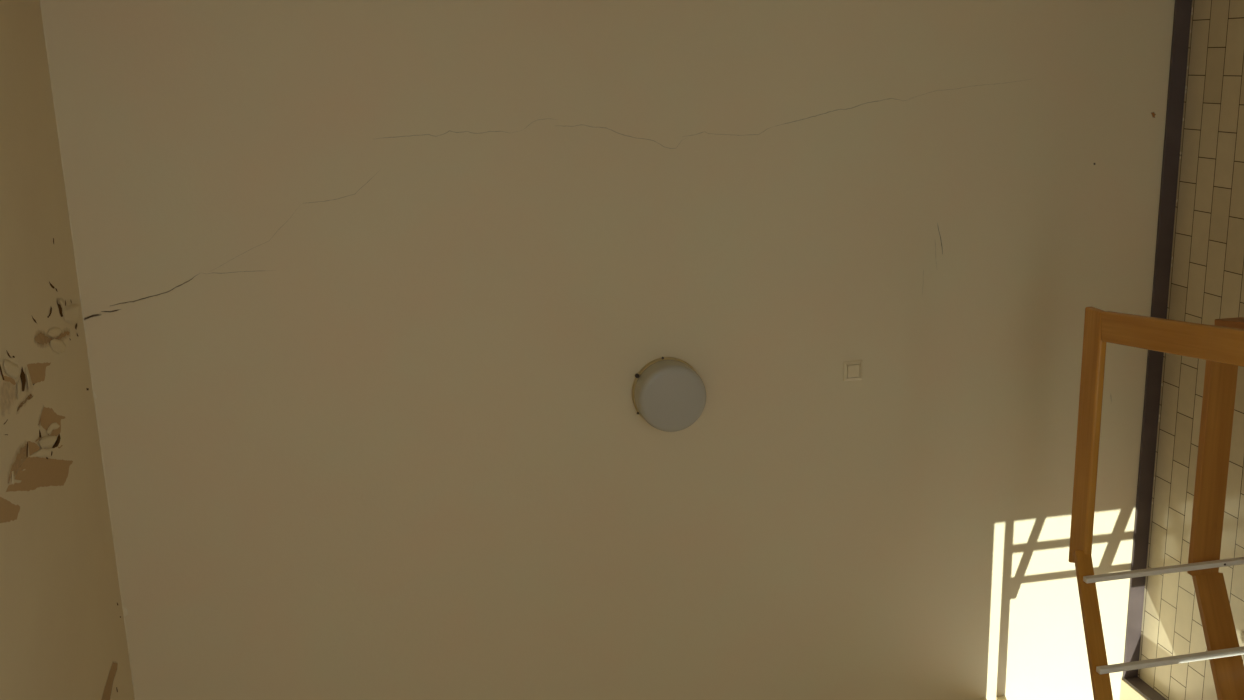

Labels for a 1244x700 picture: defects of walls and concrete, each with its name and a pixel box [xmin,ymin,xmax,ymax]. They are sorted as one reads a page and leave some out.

crack [84,276,195,320]
peeling [0,282,80,435]
peeling [0,407,73,523]